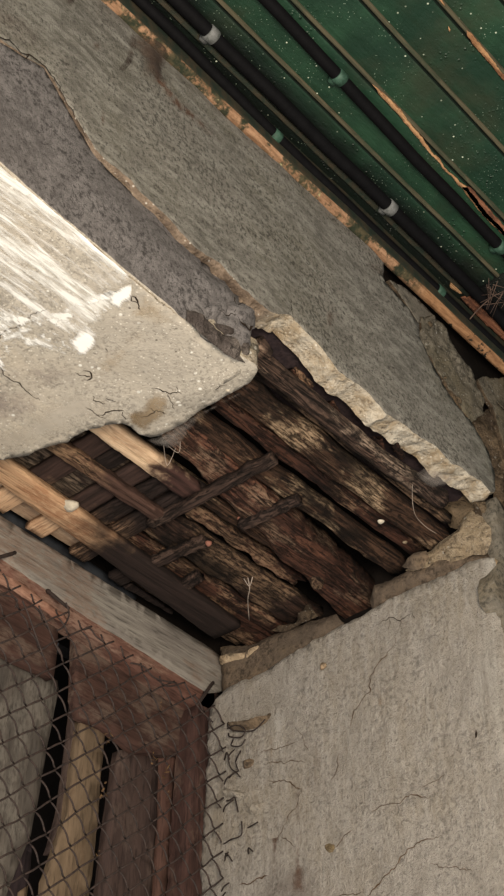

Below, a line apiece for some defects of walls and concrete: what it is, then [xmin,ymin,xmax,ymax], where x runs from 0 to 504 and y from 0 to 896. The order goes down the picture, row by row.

peeling [466,30,504,80]
peeling [372,84,504,236]
peeling [0,168,131,354]
flaking render [186,310,259,363]
crack [77,370,180,419]
flaking render [132,398,165,428]
flaking render [370,510,491,609]
crack [349,614,415,729]
crack [261,731,308,846]
crack [373,776,442,811]
crack [339,837,438,896]